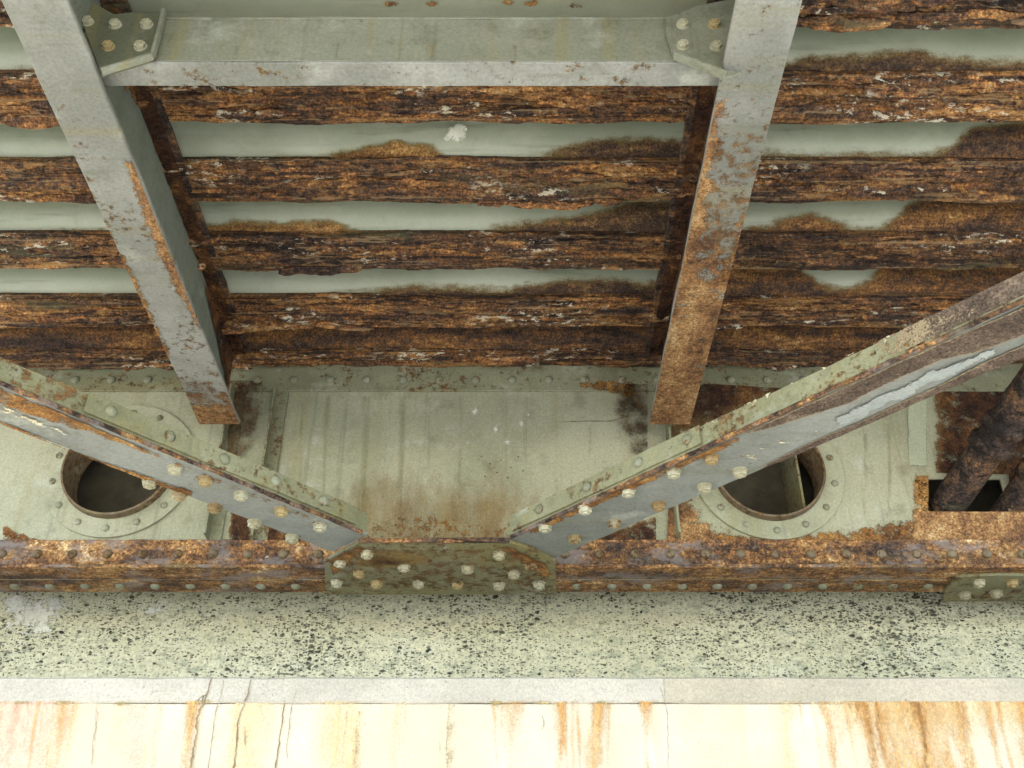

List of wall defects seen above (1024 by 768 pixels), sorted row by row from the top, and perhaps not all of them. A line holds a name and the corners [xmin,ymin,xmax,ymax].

corrosion [784,50,1024,160]
corrosion [0,86,1024,458]
peeling [744,307,1024,468]
corrosion [0,421,193,496]
corrosion [795,391,1024,540]
corrosion [3,526,37,540]
corrosion [228,513,251,540]
corrosion [330,500,552,589]
corrosion [597,499,755,543]
crack [190,678,251,768]
crack [275,694,296,768]
corrosion [812,701,1024,768]